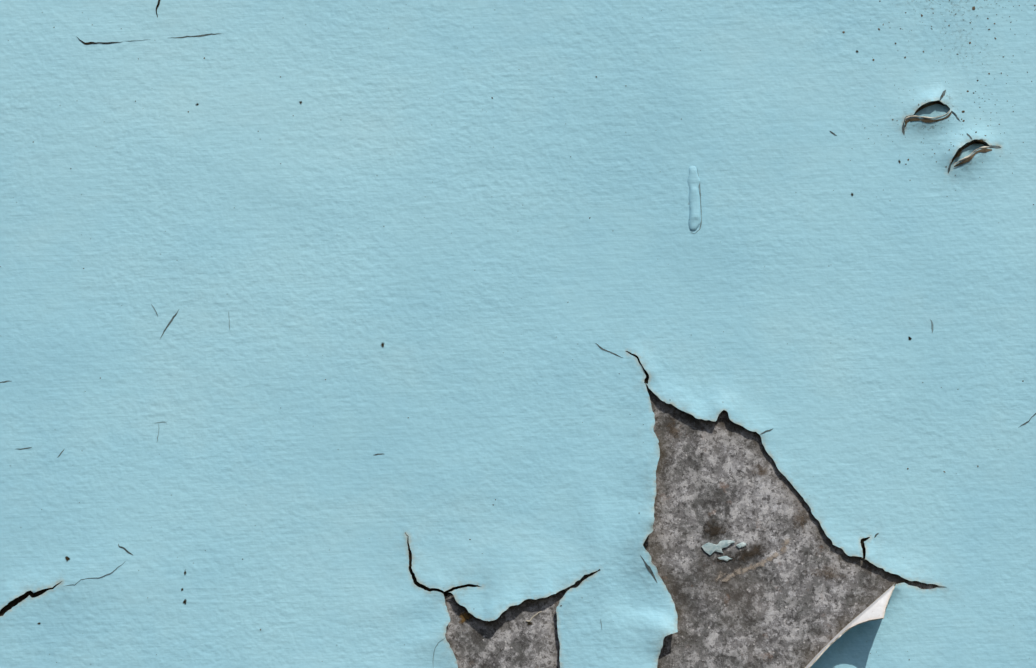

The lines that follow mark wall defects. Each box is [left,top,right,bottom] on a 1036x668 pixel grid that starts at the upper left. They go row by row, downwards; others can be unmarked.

crack [76,0,220,44]
peeling [595,343,944,668]
crack [0,544,133,616]
peeling [405,532,600,668]